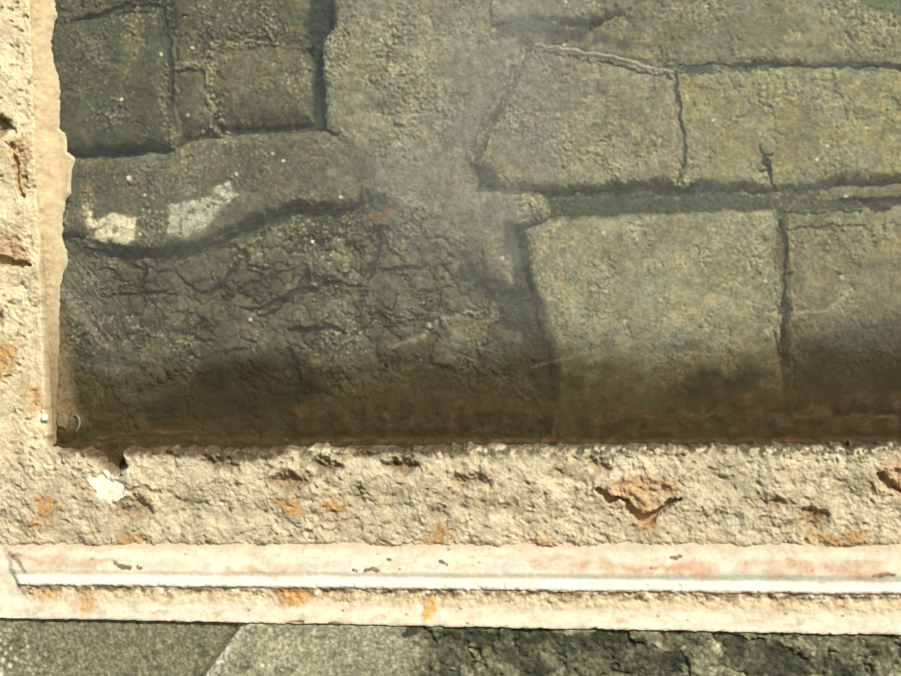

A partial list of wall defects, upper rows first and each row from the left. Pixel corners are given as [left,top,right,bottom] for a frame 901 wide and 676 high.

spalling [0,110,34,199]
leakage [82,205,137,229]
leakage [167,181,238,238]
spalling [0,229,32,269]
spalling [264,452,374,506]
spalling [379,453,423,480]
spalling [440,468,496,495]
spalling [577,451,685,527]
spalling [876,456,901,496]